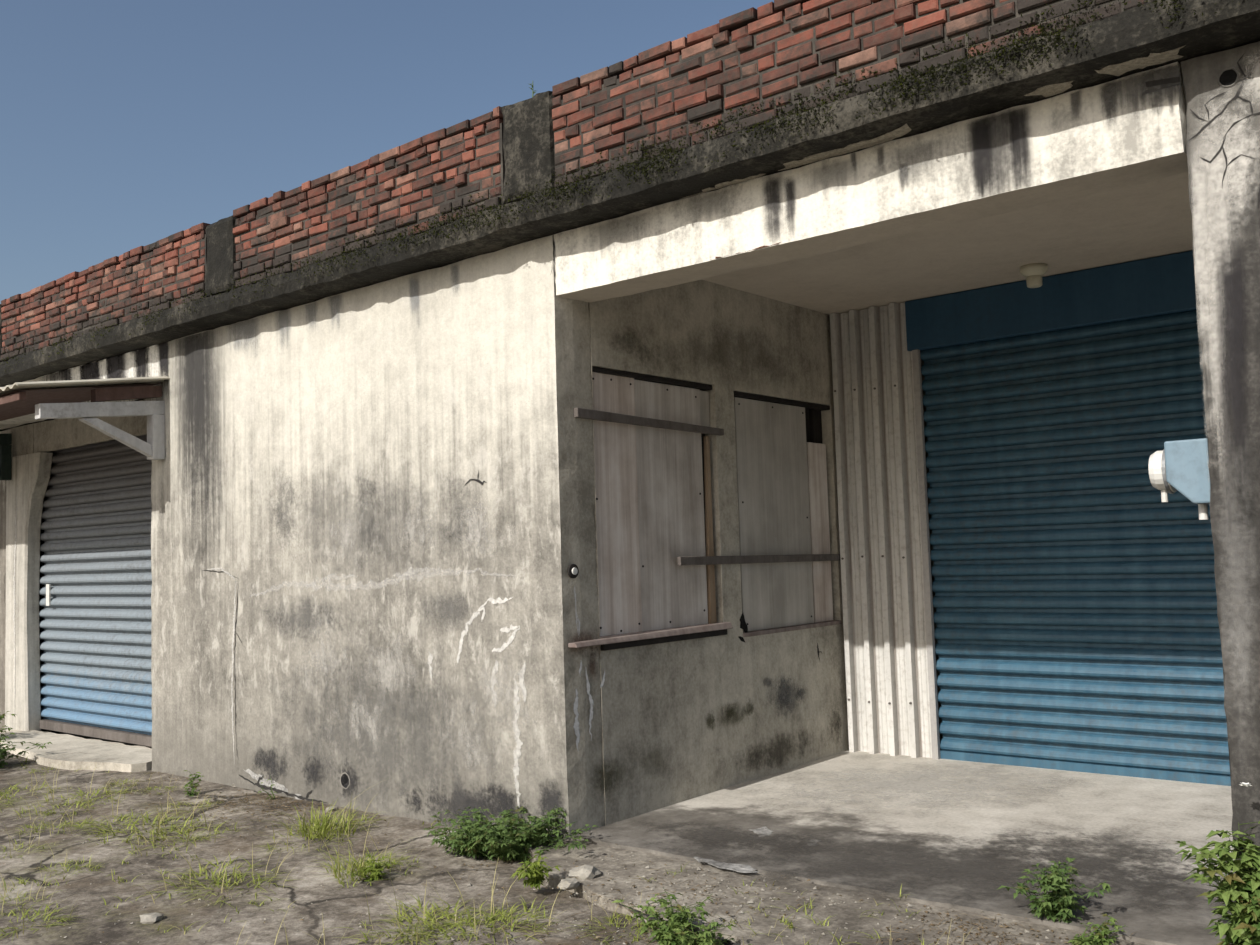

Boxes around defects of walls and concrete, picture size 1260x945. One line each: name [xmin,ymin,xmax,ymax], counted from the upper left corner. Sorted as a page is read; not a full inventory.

spalling [1095,45,1186,76]
spalling [1024,81,1073,97]
crack [1142,52,1260,184]
water stain [971,110,1027,193]
water stain [764,179,794,234]
water stain [280,600,333,632]
water stain [426,597,513,622]
water stain [579,661,605,740]
water stain [764,679,803,713]
water stain [413,663,527,828]
water stain [255,750,285,780]
water stain [541,785,561,823]